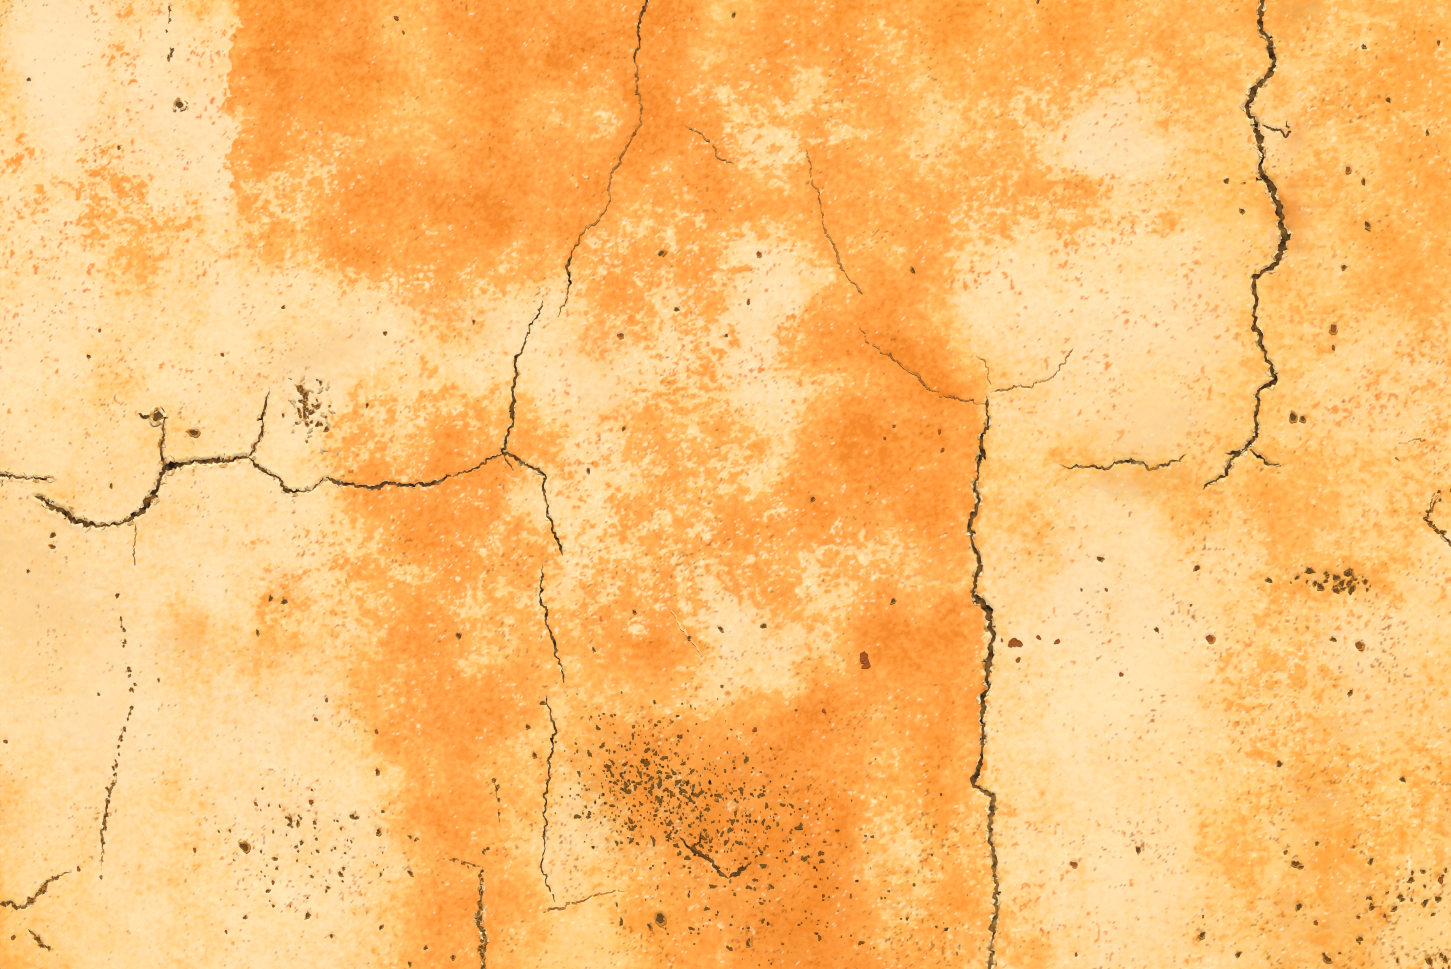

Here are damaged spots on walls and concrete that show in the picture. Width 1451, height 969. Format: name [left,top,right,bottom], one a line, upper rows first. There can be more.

crack [685,125,734,164]
crack [806,152,863,294]
crack [1061,0,1293,489]
crack [0,0,649,969]
corrosion [860,651,871,668]
crack [860,329,1073,969]
corrosion [1001,635,1060,662]